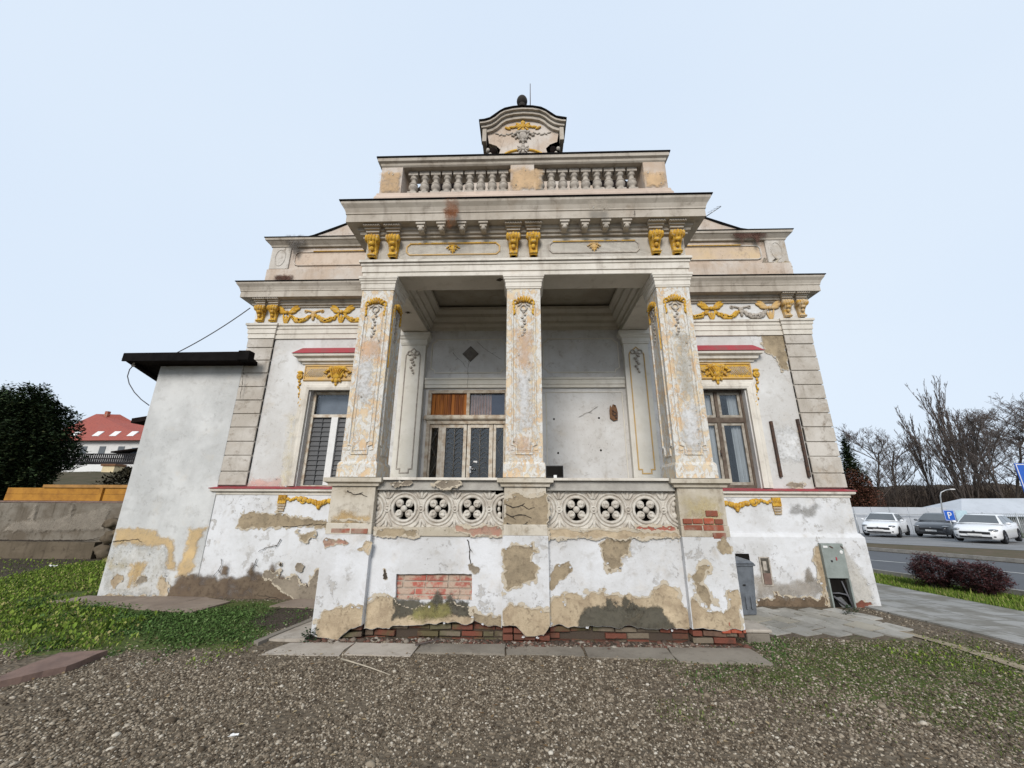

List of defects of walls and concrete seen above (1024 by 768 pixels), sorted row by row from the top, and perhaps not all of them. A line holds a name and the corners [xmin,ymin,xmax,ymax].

corrosion [444,200,458,226]
peeling [757,335,789,373]
peeling [235,510,420,555]
crack [505,504,535,525]
peeling [102,544,171,596]
damp [113,527,292,599]
peeling [312,491,746,646]
spalling [756,545,831,607]
damp [391,591,471,621]
damp [578,597,675,629]